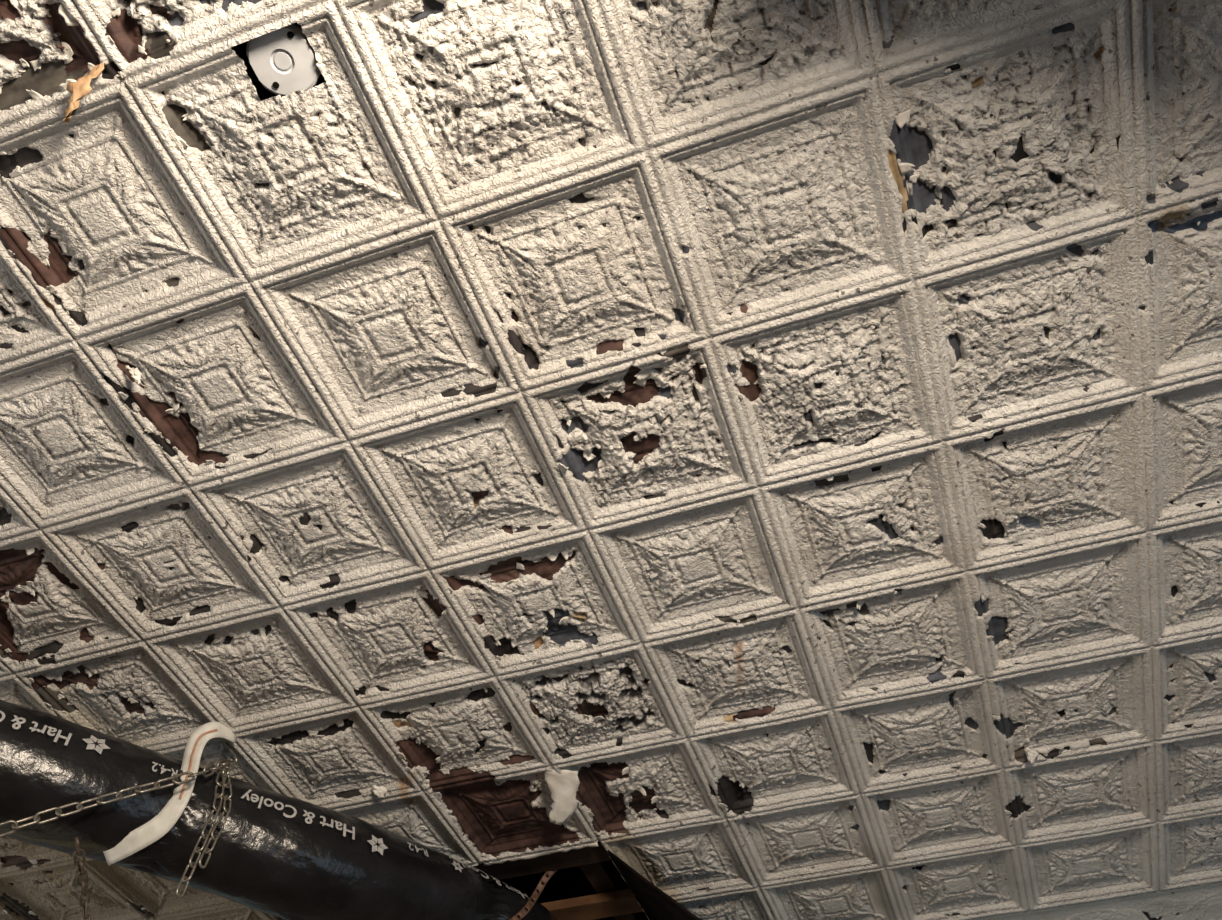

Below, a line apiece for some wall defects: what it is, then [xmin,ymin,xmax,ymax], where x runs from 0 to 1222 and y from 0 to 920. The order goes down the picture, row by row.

peeling [409,0,445,23]
peeling [887,110,957,241]
peeling [1148,197,1222,234]
peeling [0,226,88,349]
peeling [99,342,272,469]
peeling [554,328,707,482]
peeling [726,342,763,402]
peeling [0,547,157,716]
peeling [420,550,576,617]
peeling [472,608,598,660]
peeling [570,696,608,723]
peeling [380,711,669,857]